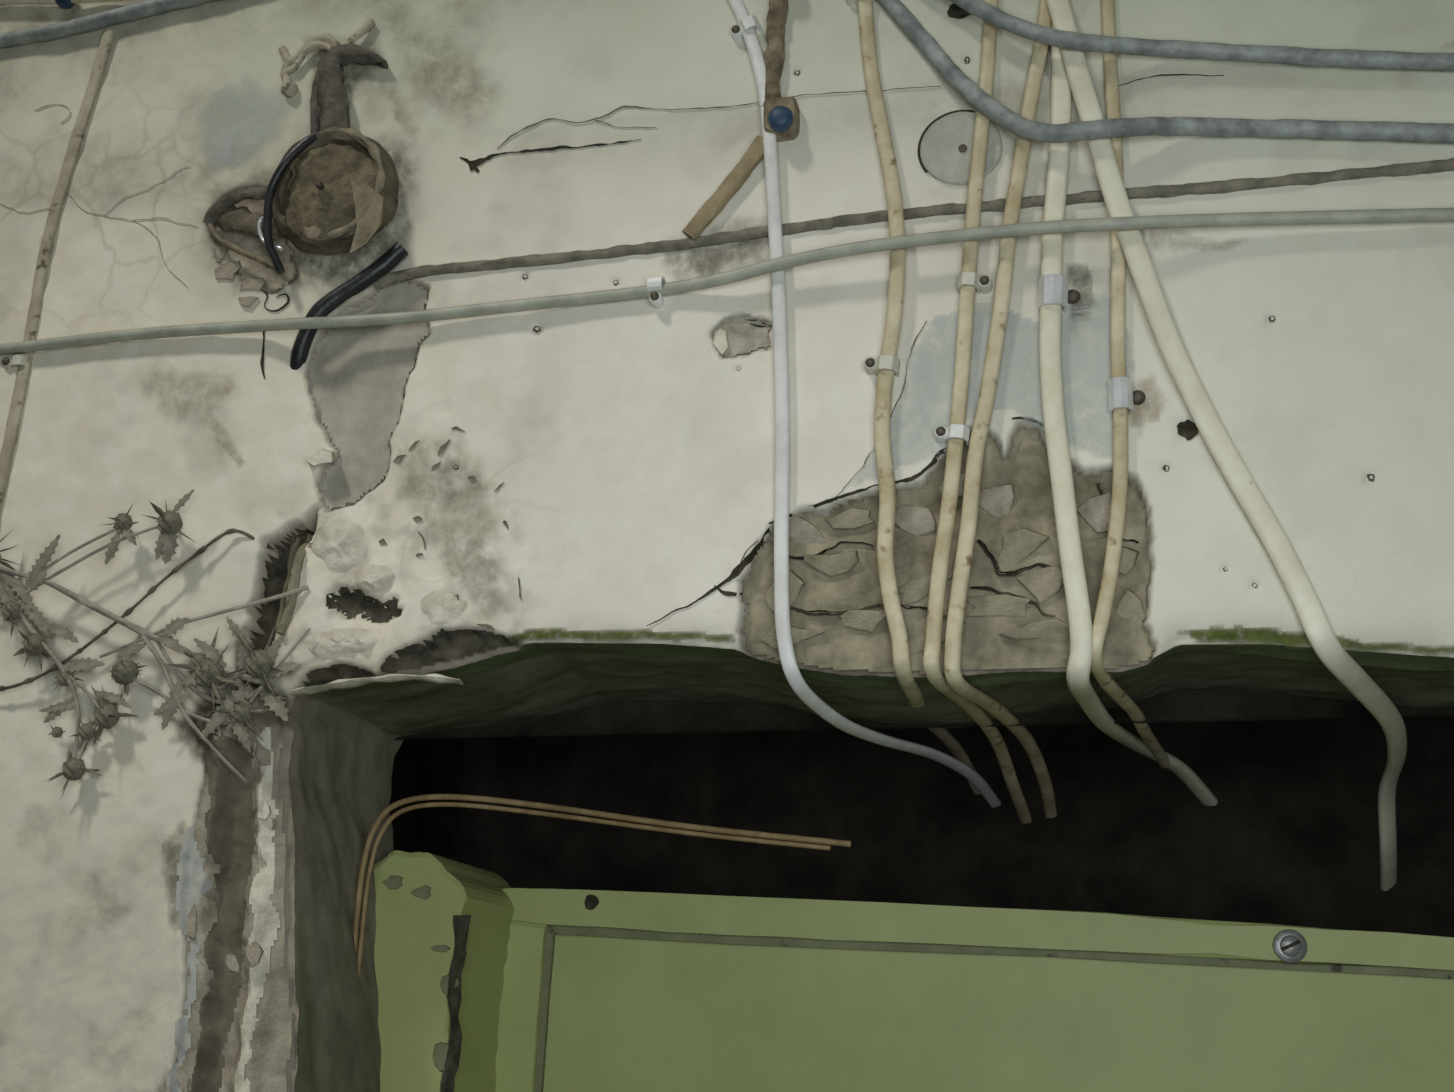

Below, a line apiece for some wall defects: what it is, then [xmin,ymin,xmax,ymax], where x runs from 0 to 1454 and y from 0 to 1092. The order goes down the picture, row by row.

crack [792,86,940,97]
crack [460,102,758,173]
flaking render [235,185,267,214]
flaking render [209,224,296,307]
flaking render [713,314,771,357]
flaking render [304,280,429,511]
peeling [431,426,464,471]
flaking render [741,314,1070,674]
spalling [250,528,315,652]
spalling [326,587,402,623]
flaking render [1072,467,1155,669]
flaking render [166,624,513,1092]